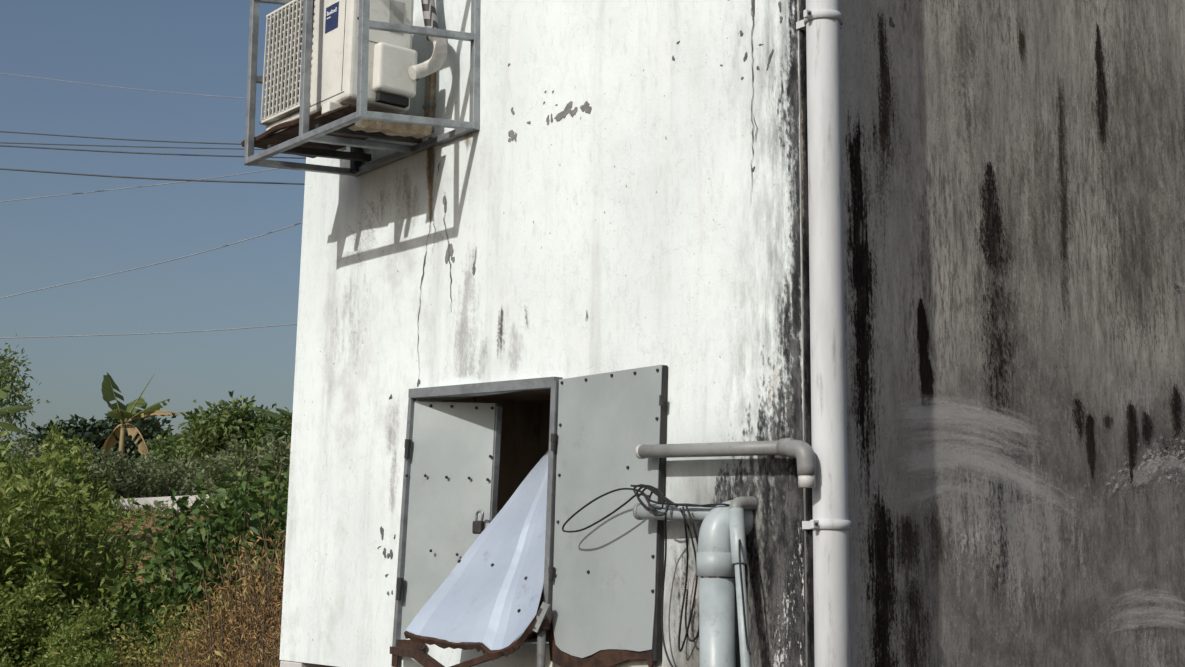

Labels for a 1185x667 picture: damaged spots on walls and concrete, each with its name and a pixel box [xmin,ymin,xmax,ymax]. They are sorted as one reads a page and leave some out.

crack [417,163,476,372]
peeling [543,90,592,125]
mould [742,0,812,447]
leakage [873,13,894,175]
leakage [1017,31,1025,58]
leakage [1080,17,1185,340]
leakage [896,82,1078,667]
leakage [1072,385,1185,499]
corrosion [391,609,654,667]
mould [713,455,815,667]